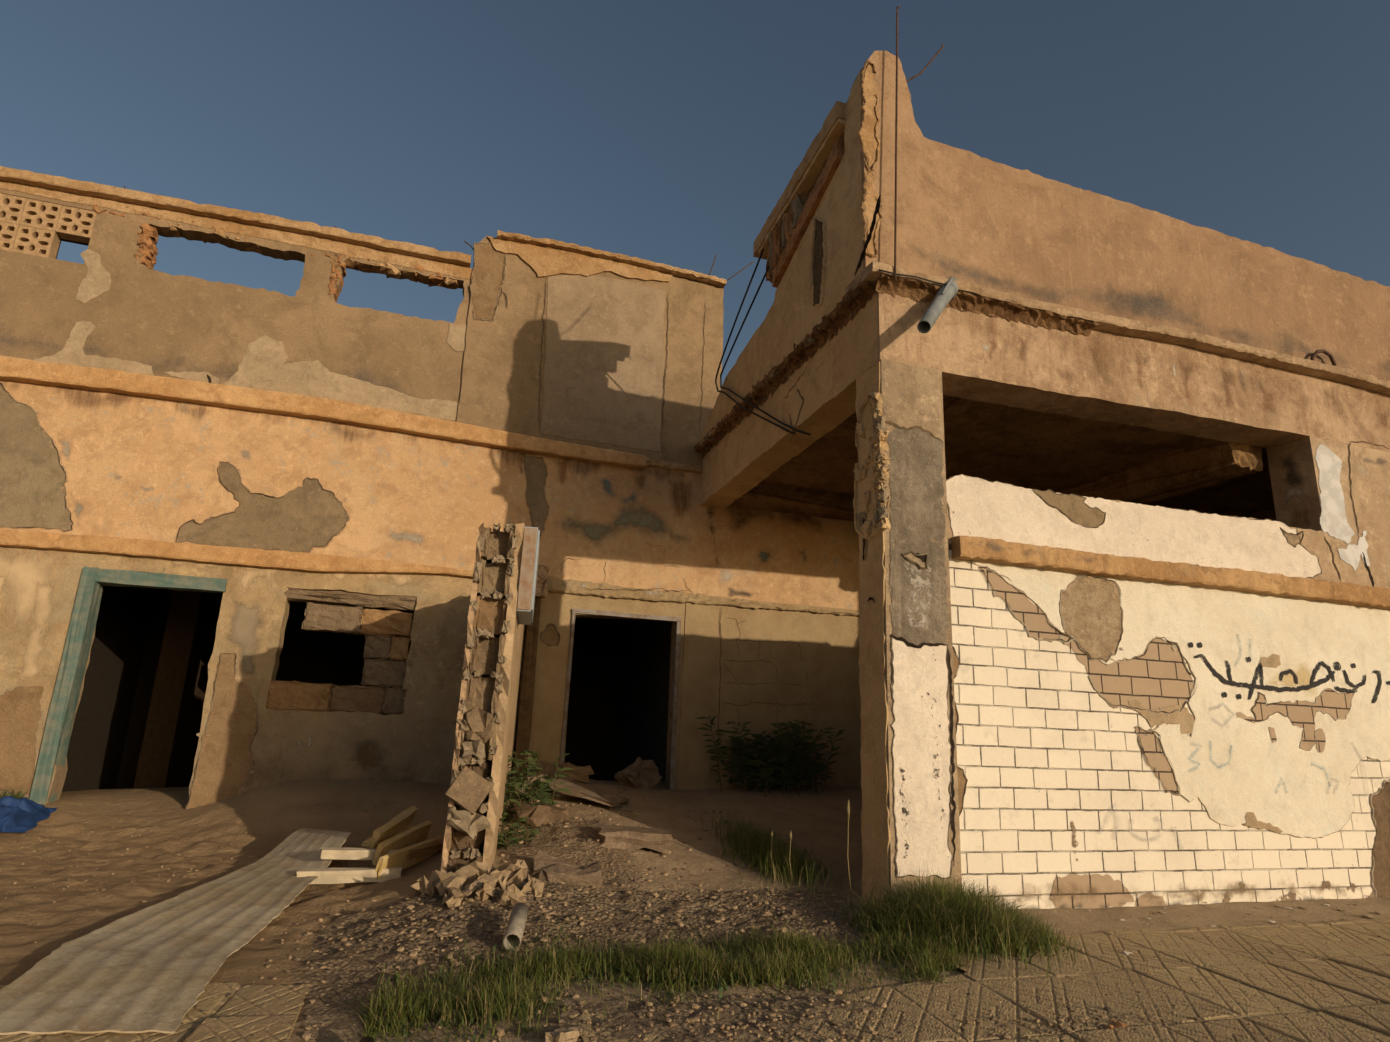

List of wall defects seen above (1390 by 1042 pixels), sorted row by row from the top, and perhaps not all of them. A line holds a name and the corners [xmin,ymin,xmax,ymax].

flaking render [0,382,73,532]
flaking render [175,461,351,553]
flaking render [523,455,550,541]
spalling [853,391,890,561]
peeling [1032,489,1106,528]
crack [1161,441,1388,587]
flaking render [1280,527,1304,548]
flaking render [1059,574,1124,663]
flaking render [185,653,260,810]
crack [891,635,956,879]
flaking render [1236,688,1356,753]
peeling [1050,873,1167,909]